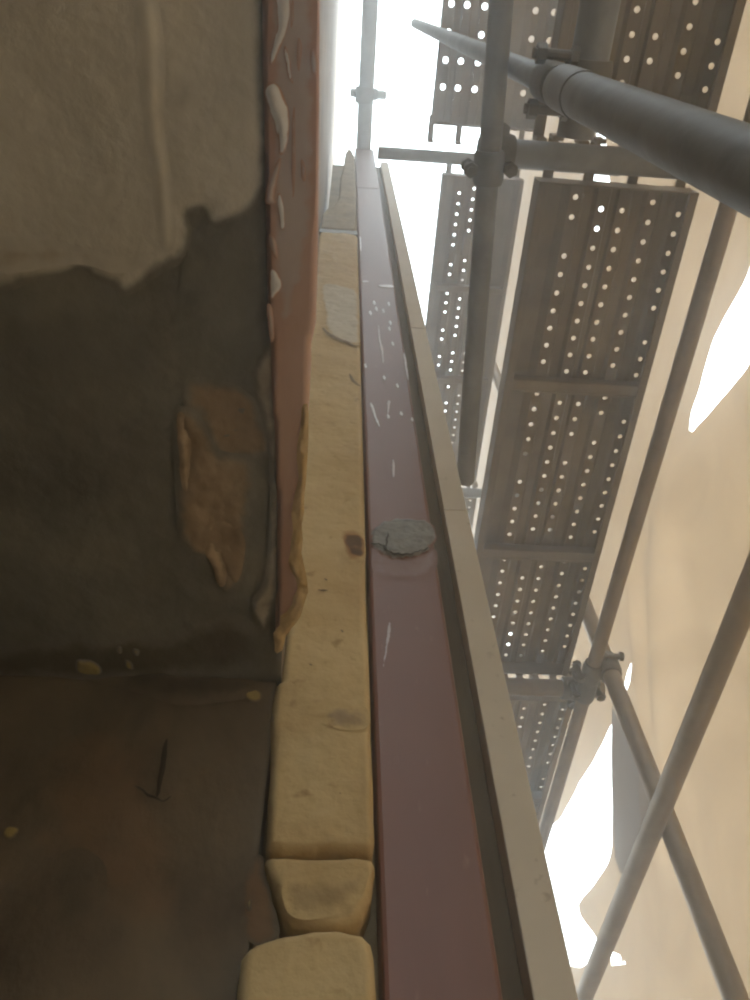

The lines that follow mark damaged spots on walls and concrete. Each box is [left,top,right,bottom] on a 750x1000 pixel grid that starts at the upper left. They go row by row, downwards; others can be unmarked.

peeling [0,0,317,342]
spalling [173,377,268,593]
crack [134,738,171,803]